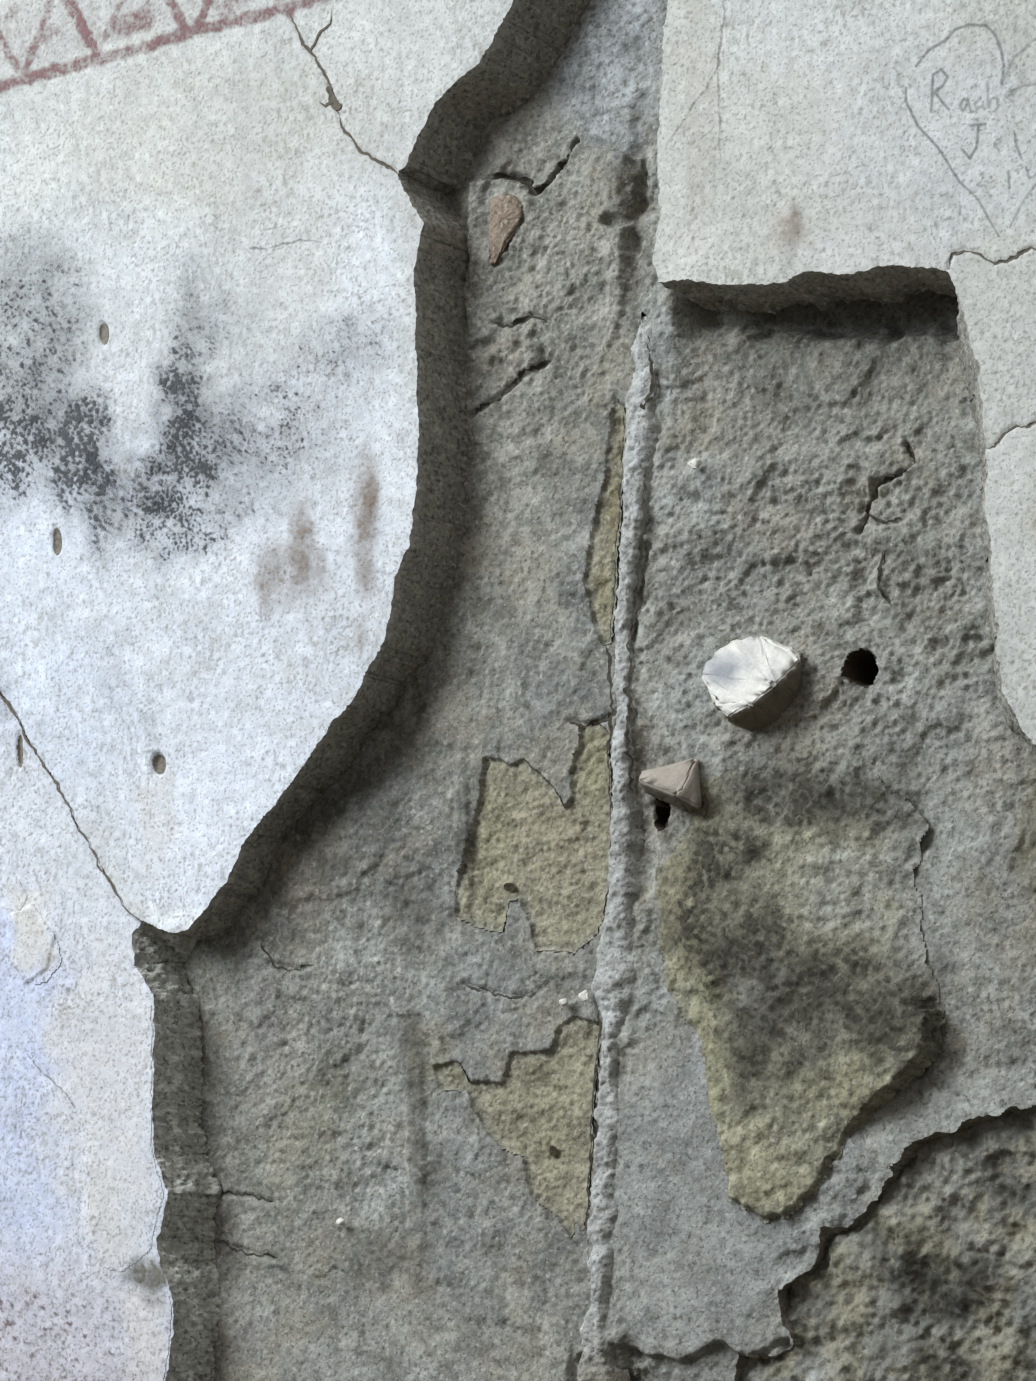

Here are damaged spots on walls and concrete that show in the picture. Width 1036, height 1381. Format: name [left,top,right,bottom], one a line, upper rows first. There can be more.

crack [291,10,403,175]
crack [948,246,1036,269]
leakage [0,245,396,561]
crack [863,446,915,604]
crack [0,694,140,922]
spalling [35,0,668,1381]
spalling [602,172,1036,1381]